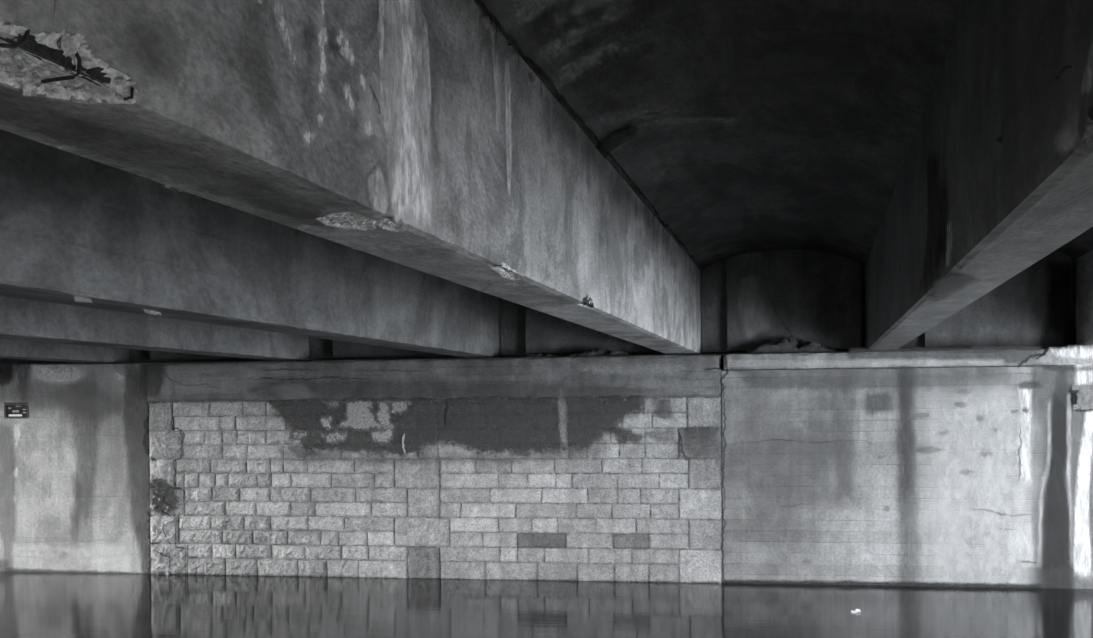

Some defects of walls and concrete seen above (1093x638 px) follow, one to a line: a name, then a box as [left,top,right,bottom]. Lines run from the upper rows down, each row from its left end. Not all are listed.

spalling [0,20,138,104]
spalling [316,212,409,232]
damp [1041,264,1079,349]
damp [0,363,353,578]
crack [704,354,728,582]
damp [630,364,1093,589]